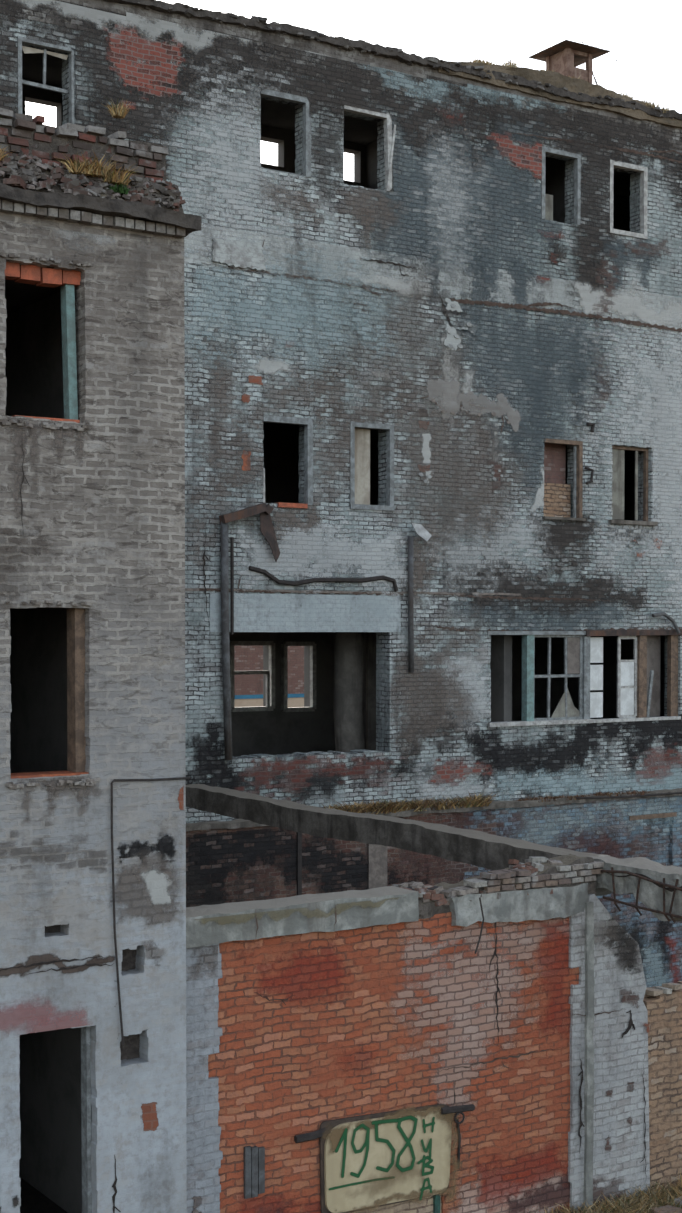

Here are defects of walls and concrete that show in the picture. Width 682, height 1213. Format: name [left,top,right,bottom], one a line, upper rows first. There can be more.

spalling [104,24,185,109]
leakage [260,179,319,229]
leakage [509,258,532,321]
leakage [582,239,660,294]
peeling [444,298,476,351]
peeling [420,378,521,432]
leakage [624,740,643,779]
leakage [600,894,679,983]
crack [432,922,585,1154]
crack [574,1009,635,1038]
crack [639,1064,647,1191]
crack [112,1155,121,1213]